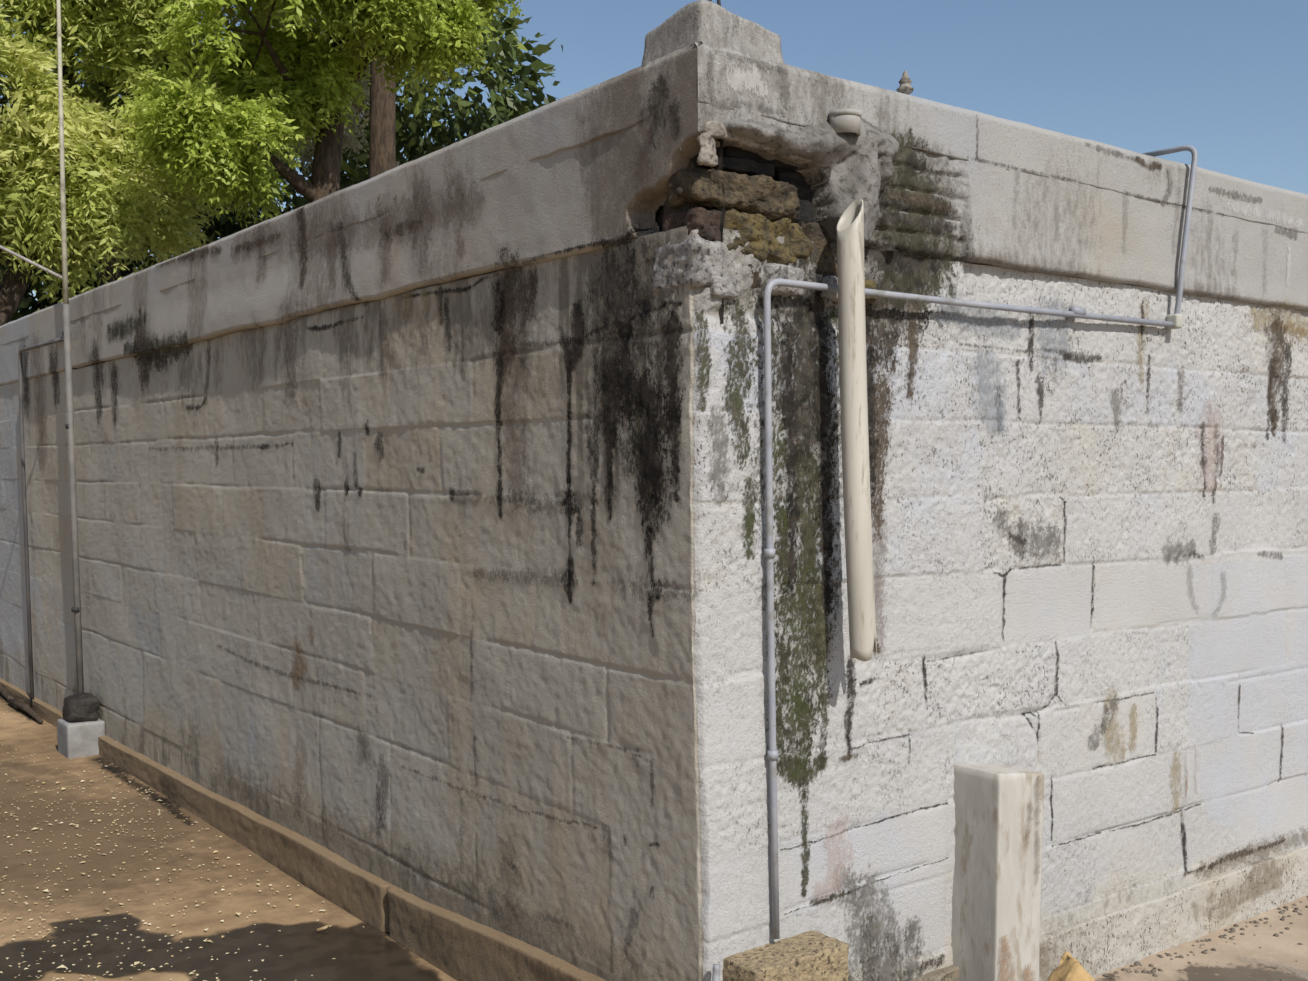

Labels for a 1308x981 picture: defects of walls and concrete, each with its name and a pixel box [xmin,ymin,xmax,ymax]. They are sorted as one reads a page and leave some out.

spalling [652,49,838,324]
water stain [156,232,281,268]
water stain [296,207,308,289]
water stain [336,220,368,308]
spalling [865,279,877,305]
water stain [19,336,30,413]
water stain [48,344,60,409]
water stain [89,340,118,426]
water stain [488,243,538,519]
water stain [1264,310,1308,441]
water stain [561,228,757,637]
water stain [756,256,945,981]